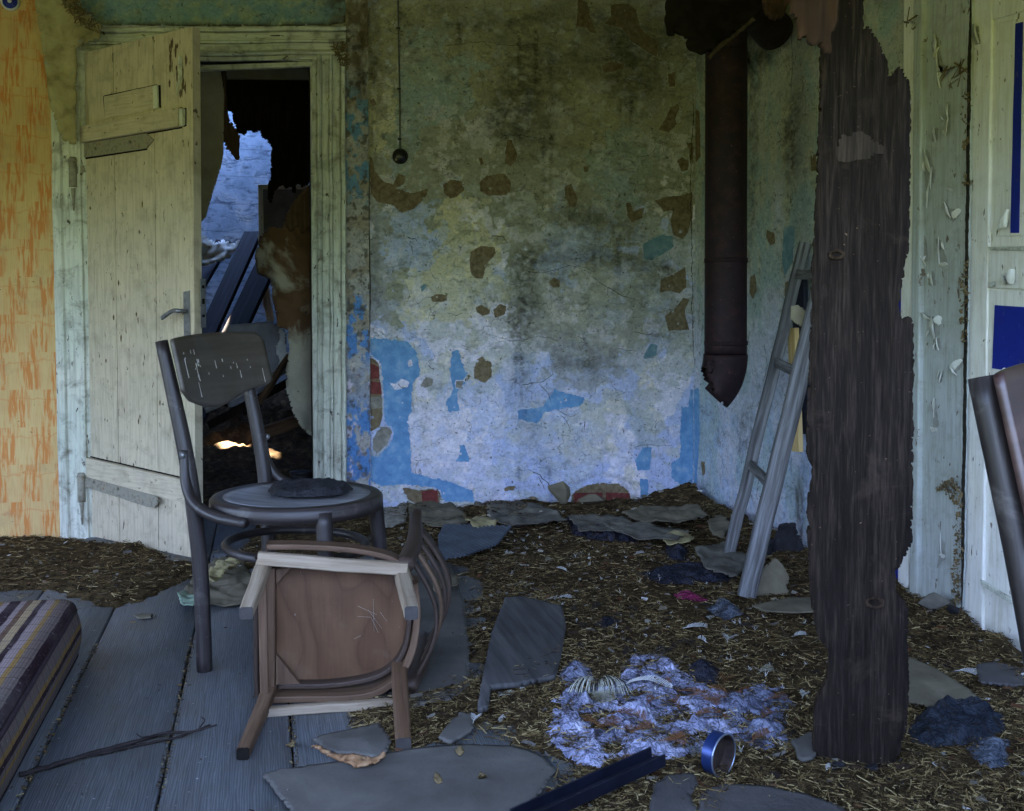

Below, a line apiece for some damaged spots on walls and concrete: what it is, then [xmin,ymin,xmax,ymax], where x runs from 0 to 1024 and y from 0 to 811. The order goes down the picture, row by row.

flaking render [369,151,428,214]
flaking render [442,139,520,199]
flaking render [625,102,701,261]
flaking render [420,281,448,303]
flaking render [468,245,503,280]
flaking render [659,266,690,332]
peeling [370,337,476,504]
peeling [443,349,493,415]
peeling [517,385,585,424]
peeling [664,386,711,484]
spalling [806,49,822,628]
peeling [937,358,963,383]